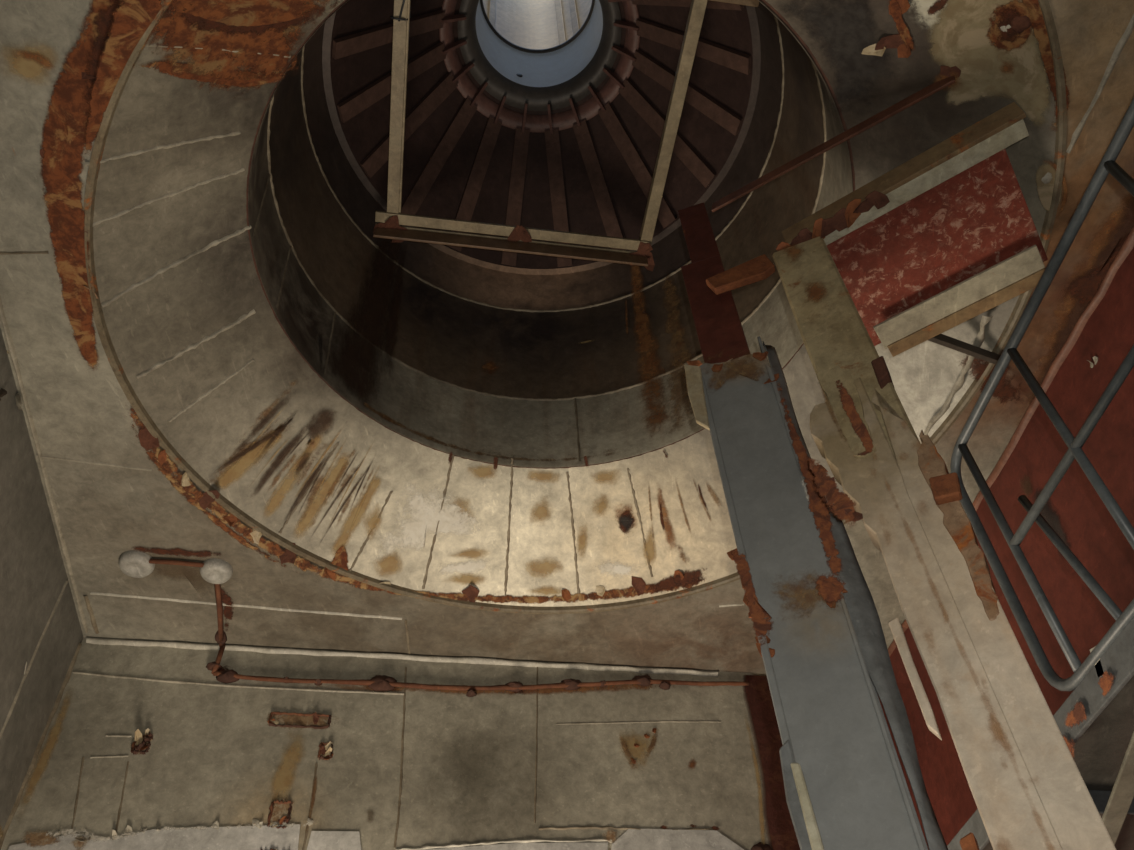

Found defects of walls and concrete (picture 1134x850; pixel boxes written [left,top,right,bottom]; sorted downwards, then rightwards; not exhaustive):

peeling [862,0,1069,128]
rust [9,0,338,369]
rust [625,265,863,610]
damp [596,473,614,482]
rust [130,403,705,604]
damp [367,486,478,574]
damp [441,550,487,584]
damp [533,502,549,520]
damp [529,561,559,595]
damp [578,531,586,550]
damp [644,534,655,562]
rust [221,589,234,631]